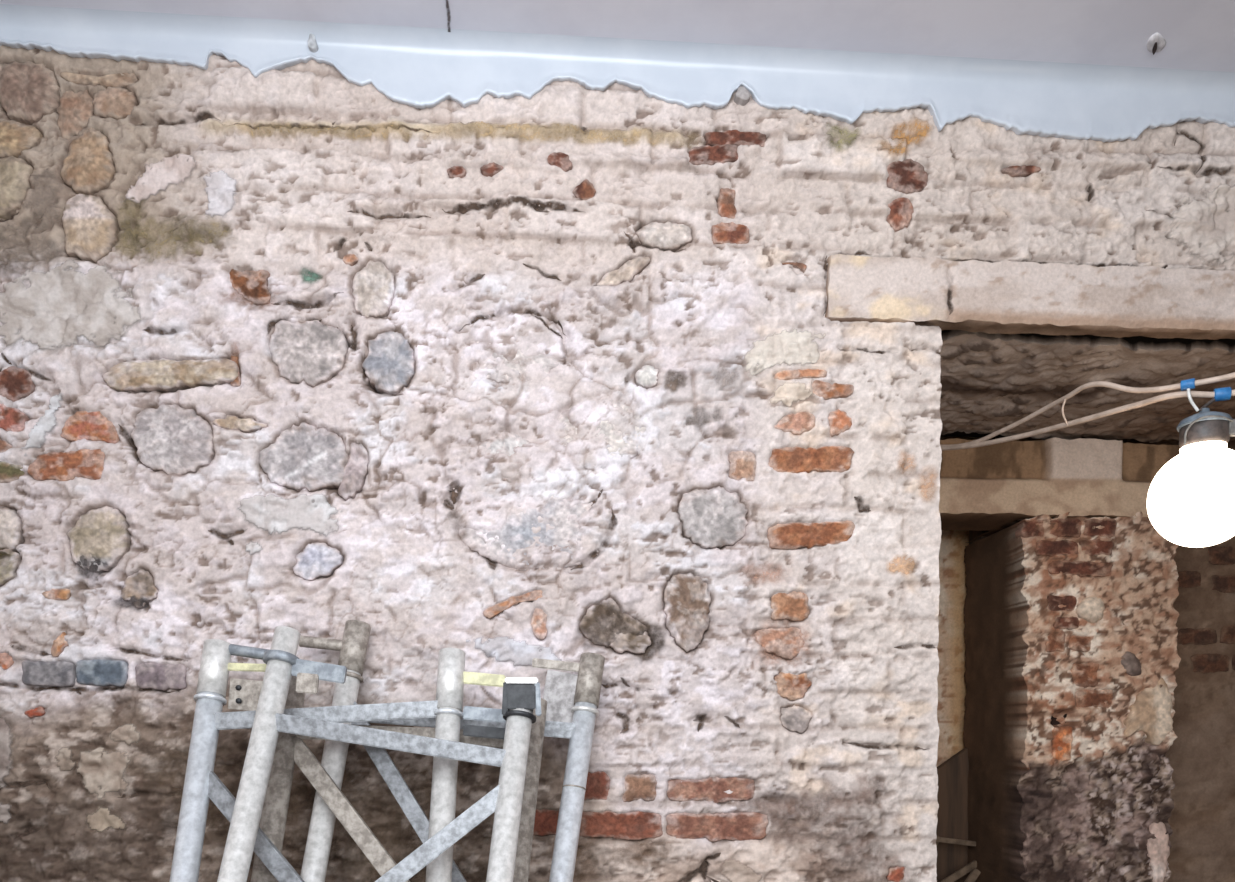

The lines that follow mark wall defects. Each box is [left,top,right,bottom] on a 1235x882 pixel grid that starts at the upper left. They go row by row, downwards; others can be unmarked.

peeling [0,4,1235,142]
crack [1160,131,1230,176]